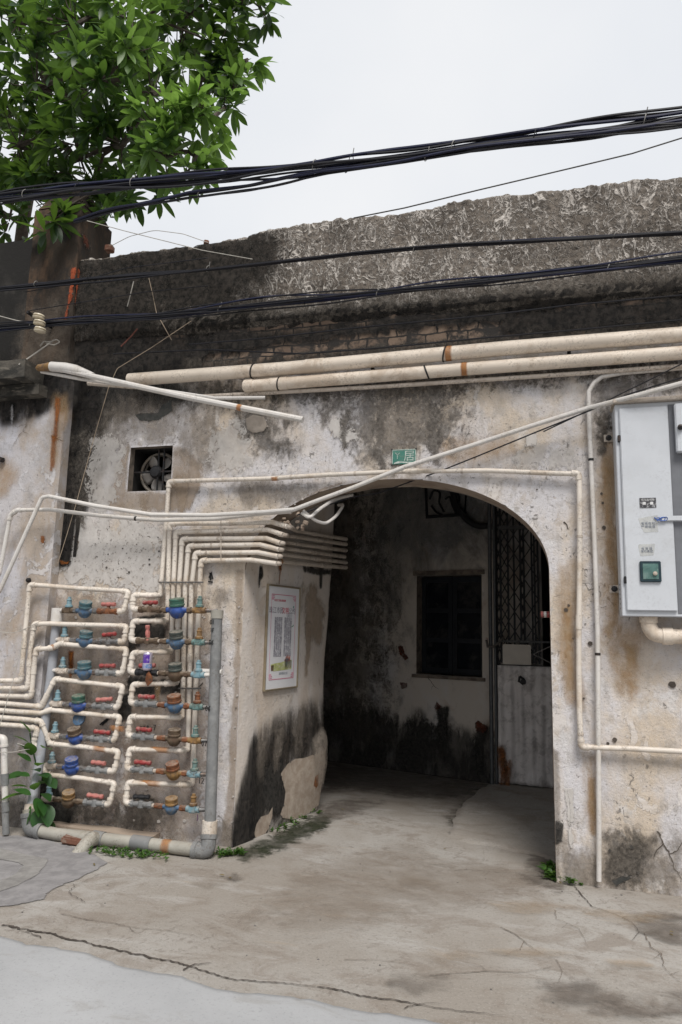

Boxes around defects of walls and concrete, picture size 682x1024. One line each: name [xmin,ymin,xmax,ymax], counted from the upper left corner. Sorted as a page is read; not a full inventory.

corrosion [50,398,62,470]
leakage [0,232,682,848]
flaking render [254,749,326,838]
corrosion [498,747,511,786]
crack [654,831,682,878]